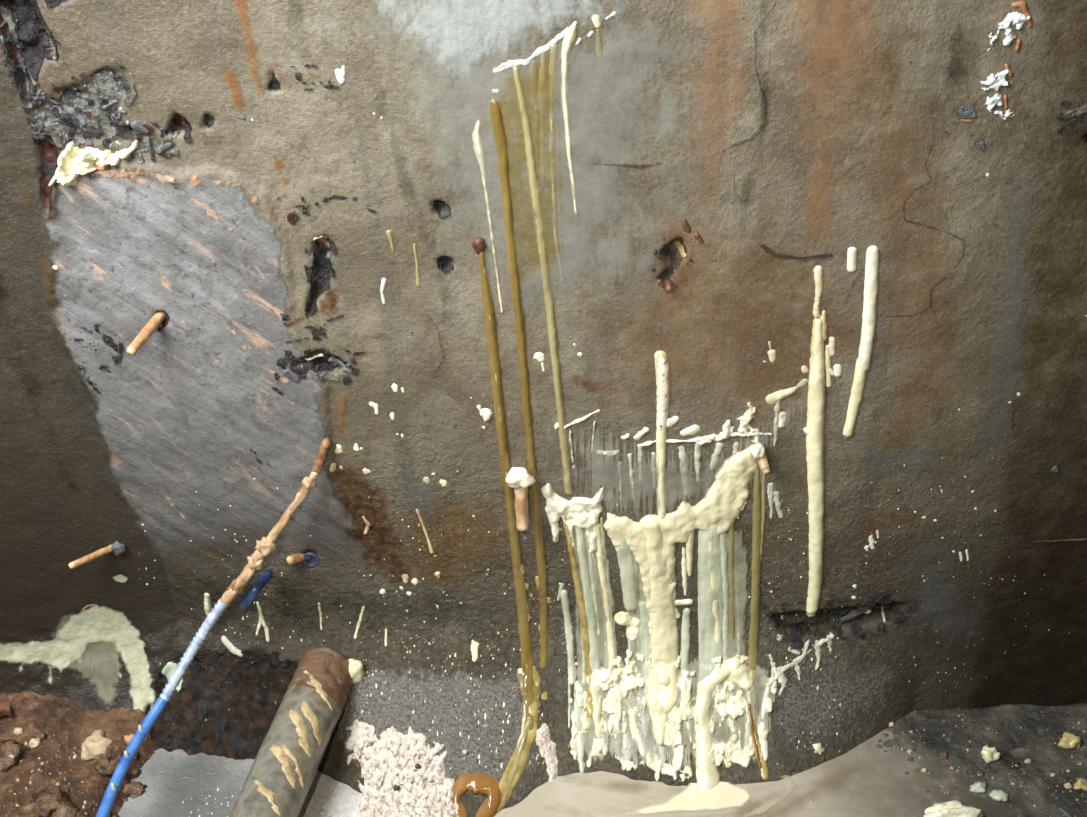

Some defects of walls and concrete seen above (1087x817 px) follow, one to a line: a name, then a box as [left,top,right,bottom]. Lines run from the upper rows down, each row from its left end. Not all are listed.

damp [402,0,566,68]
damp [987,0,1033,52]
spalling [0,0,192,218]
damp [981,63,1014,120]
spalling [277,194,368,225]
damp [493,11,617,495]
spalling [78,367,100,394]
spalling [73,324,124,372]
spalling [272,234,365,395]
damp [472,89,548,669]